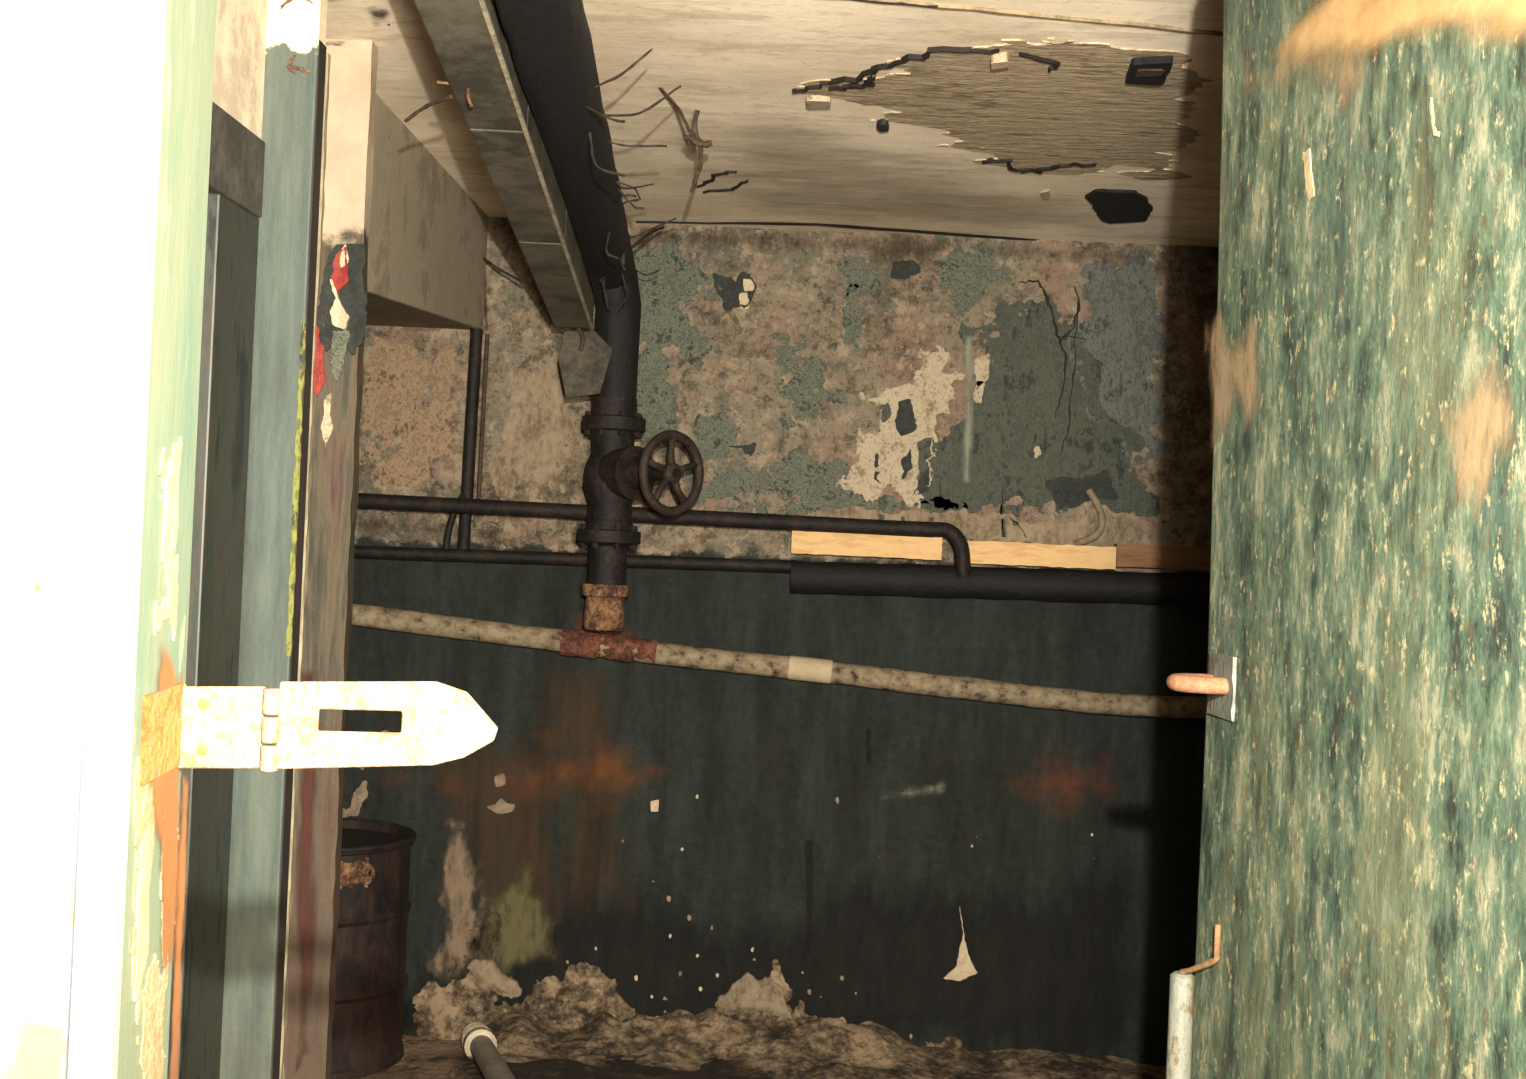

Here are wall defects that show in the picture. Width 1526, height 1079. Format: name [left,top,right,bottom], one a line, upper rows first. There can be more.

spalling [792,38,1213,224]
spalling [314,243,457,489]
peeling [632,233,1174,547]
peeling [153,437,182,641]
peeling [131,757,188,1079]